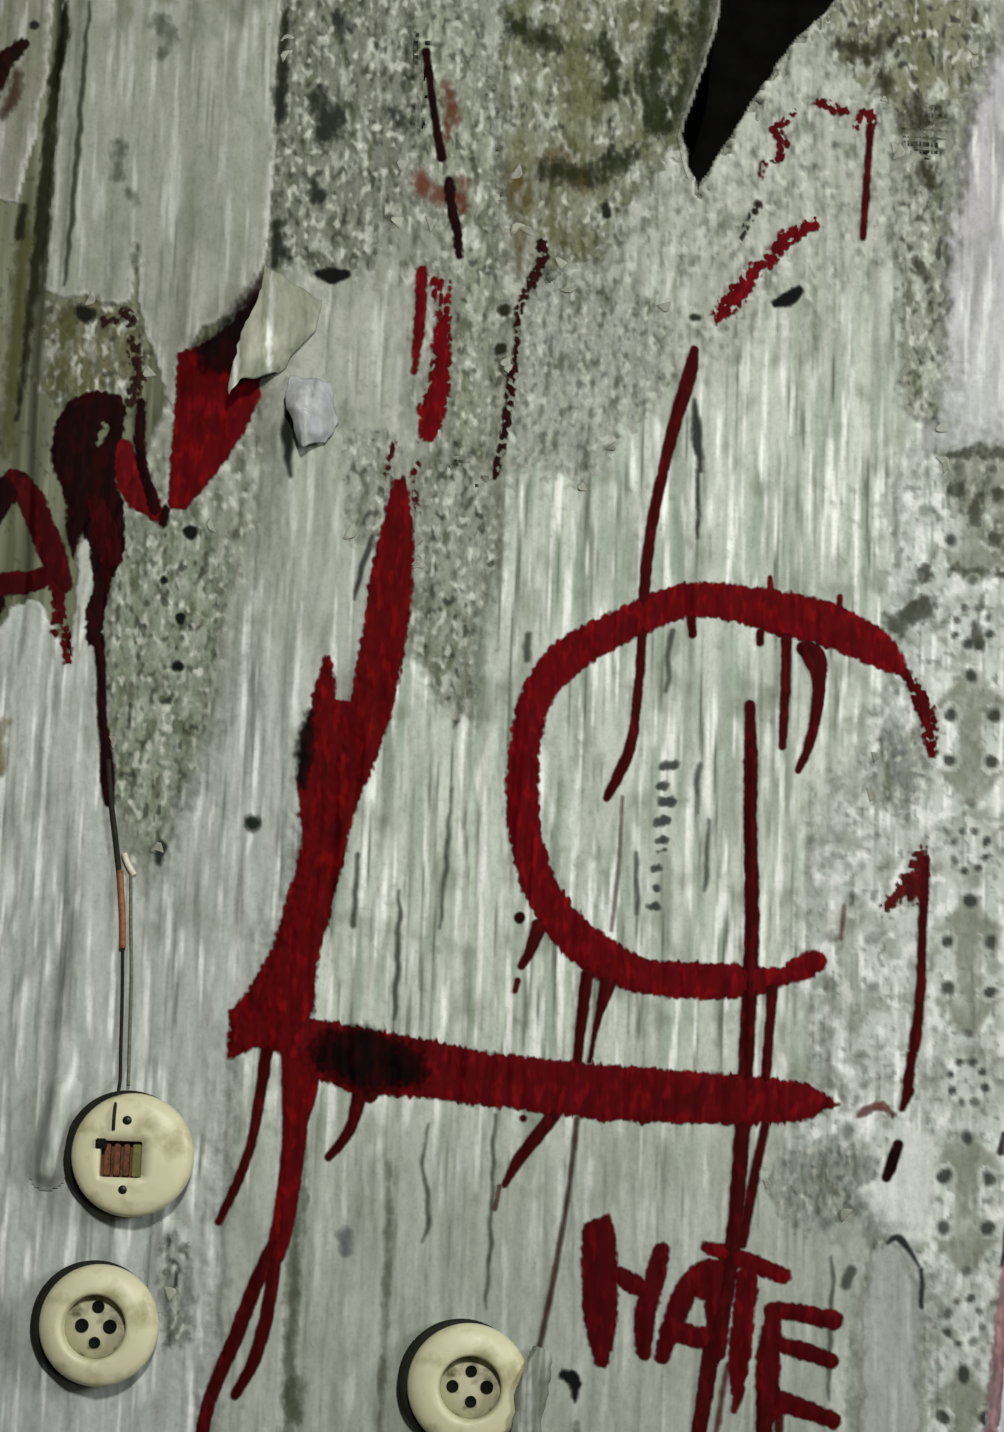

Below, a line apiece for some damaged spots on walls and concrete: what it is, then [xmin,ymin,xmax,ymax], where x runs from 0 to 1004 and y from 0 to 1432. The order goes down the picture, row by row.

peeling [269,0,714,726]
peeling [864,728,929,811]
peeling [763,1139,872,1230]